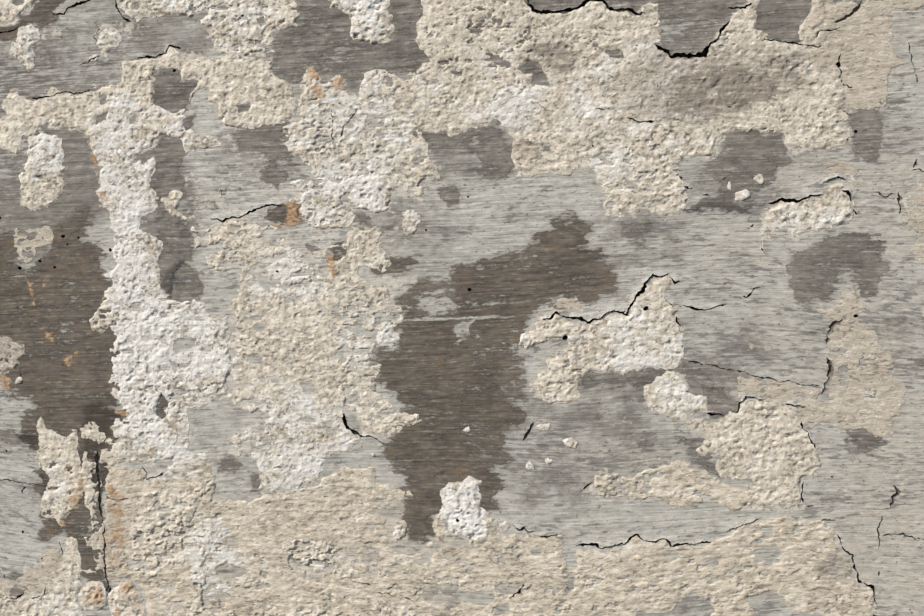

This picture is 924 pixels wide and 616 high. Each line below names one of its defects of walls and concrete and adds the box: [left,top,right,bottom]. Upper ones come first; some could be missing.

crack [527,0,644,15]
crack [655,3,752,59]
crack [762,0,862,88]
flaking render [283,0,924,239]
flaking render [0,0,422,491]
crack [210,204,283,223]
crack [543,273,843,448]
flaking render [36,416,102,526]
crack [342,413,382,443]
flaking render [0,449,876,616]
crack [513,519,758,549]
crack [801,482,880,616]